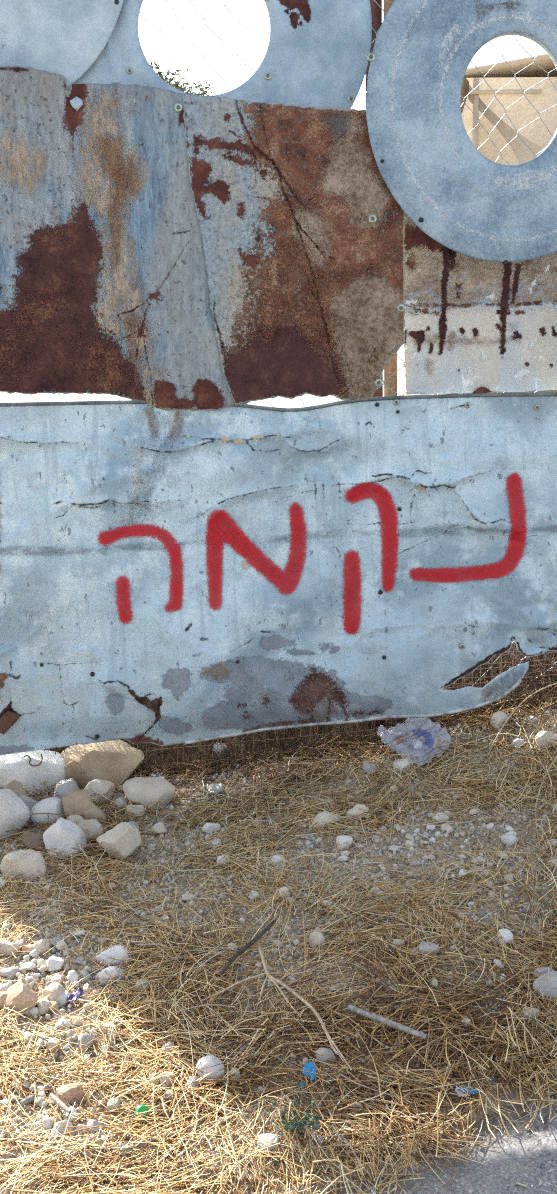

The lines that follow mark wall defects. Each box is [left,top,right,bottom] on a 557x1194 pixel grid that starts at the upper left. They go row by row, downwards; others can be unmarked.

corrosion [279,0,311,29]
corrosion [0,101,557,437]
crack [228,100,340,386]
corrosion [238,667,382,732]